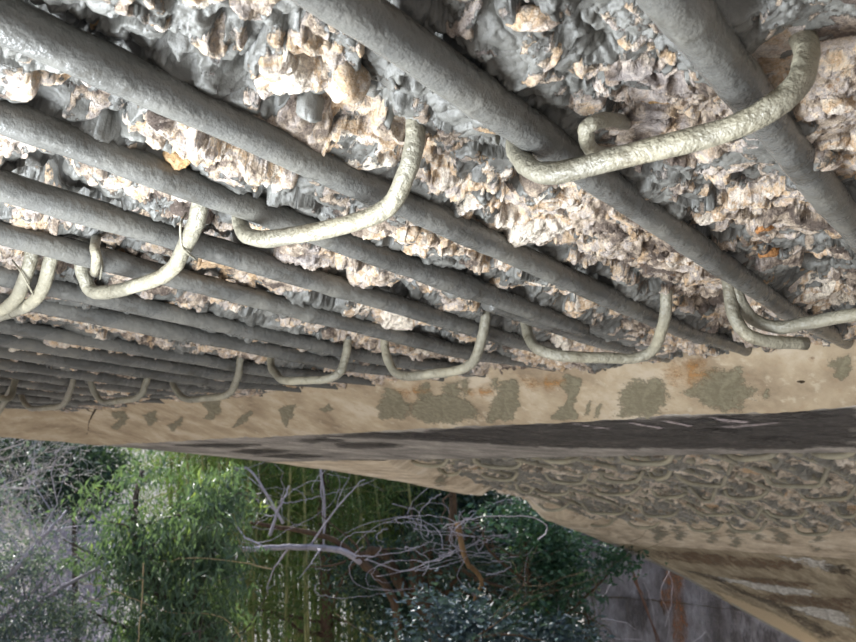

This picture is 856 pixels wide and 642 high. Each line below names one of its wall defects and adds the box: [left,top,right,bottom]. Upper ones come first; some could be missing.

spalling [715,0,856,203]
spalling [0,0,785,364]
spalling [616,133,856,315]
spalling [0,256,623,413]
spalling [744,320,832,347]
spalling [831,321,856,341]
spalling [419,453,856,533]